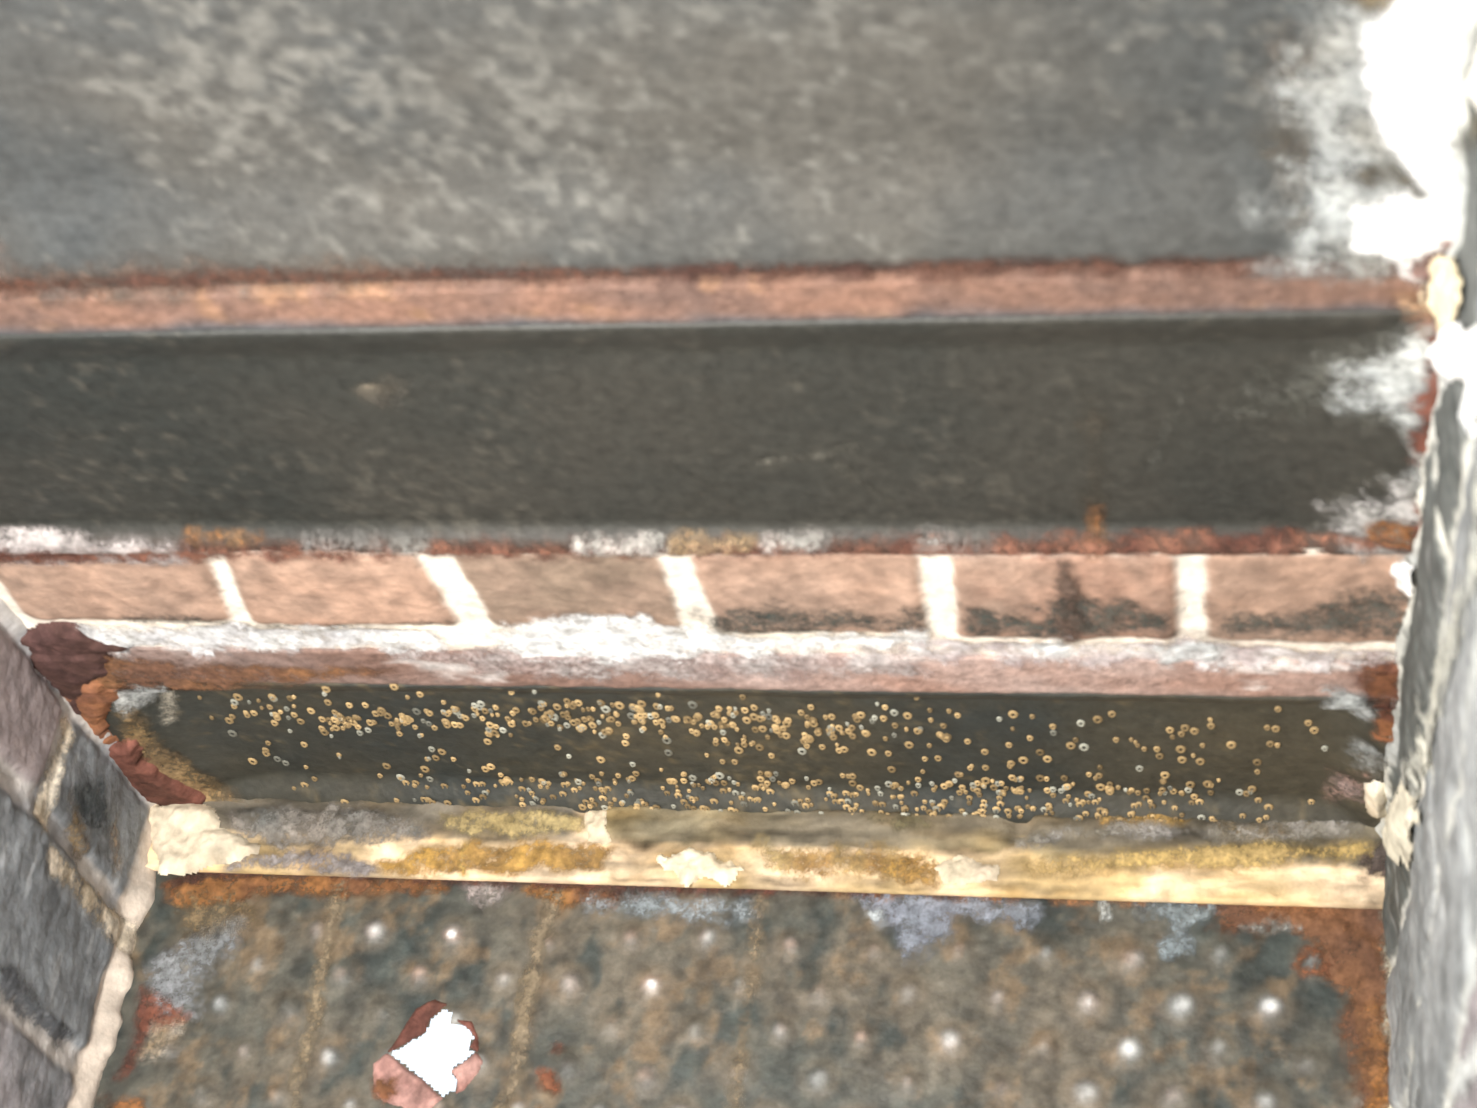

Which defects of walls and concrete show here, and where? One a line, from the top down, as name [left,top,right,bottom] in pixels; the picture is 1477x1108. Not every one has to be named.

efflorescence [1264,0,1472,282]
rust [0,240,1453,343]
efflorescence [1242,318,1437,564]
rust [1407,361,1438,459]
damp [79,613,1398,691]
damp [753,815,939,887]
damp [1016,813,1373,876]
damp [118,709,612,1108]
rust [121,987,187,1077]
rust [1197,904,1391,1108]
rust [98,1094,144,1108]